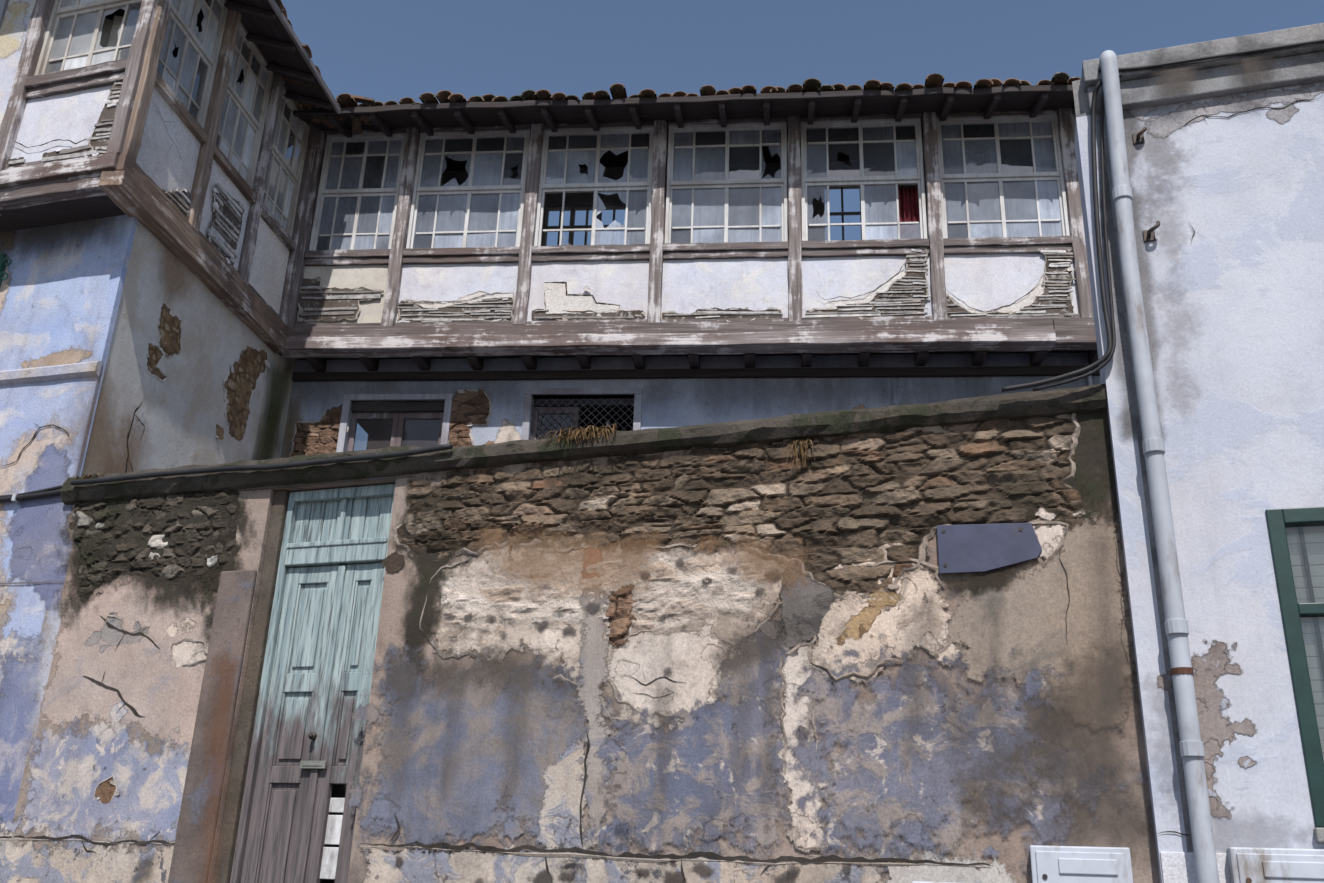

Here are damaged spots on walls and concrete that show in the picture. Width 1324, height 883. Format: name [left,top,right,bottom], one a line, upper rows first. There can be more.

crack [1182,95,1323,127]
peeling [399,290,514,323]
peeling [806,254,929,320]
peeling [946,249,1074,318]
crack [3,423,70,466]
crack [1059,552,1070,646]
peeling [0,414,216,883]
crack [83,616,160,717]
peeling [349,507,1146,883]
peeling [1191,640,1257,818]
crack [0,830,175,853]
crack [359,732,991,882]